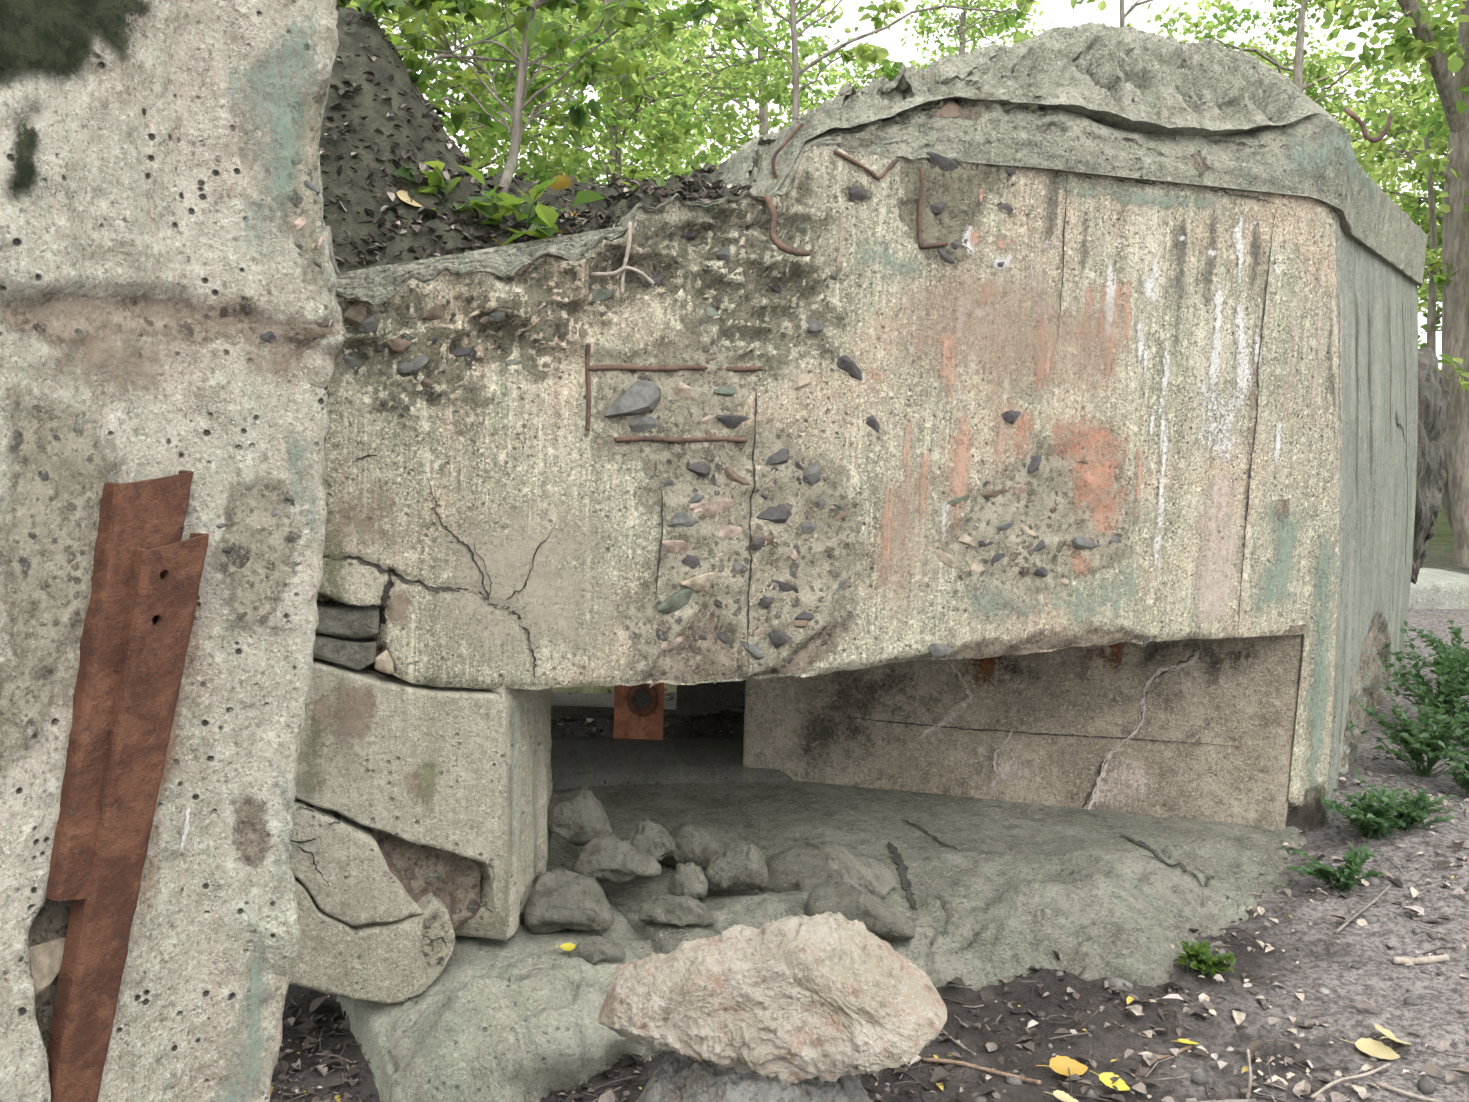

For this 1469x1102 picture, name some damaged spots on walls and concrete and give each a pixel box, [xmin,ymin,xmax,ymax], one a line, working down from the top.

spalling [826,92,1022,266]
spalling [991,255,1012,271]
spalling [0,81,870,688]
spalling [866,415,880,433]
spalling [0,390,126,770]
crack [317,480,556,686]
crack [1082,649,1202,810]
crack [291,799,353,886]
crack [1120,835,1206,887]